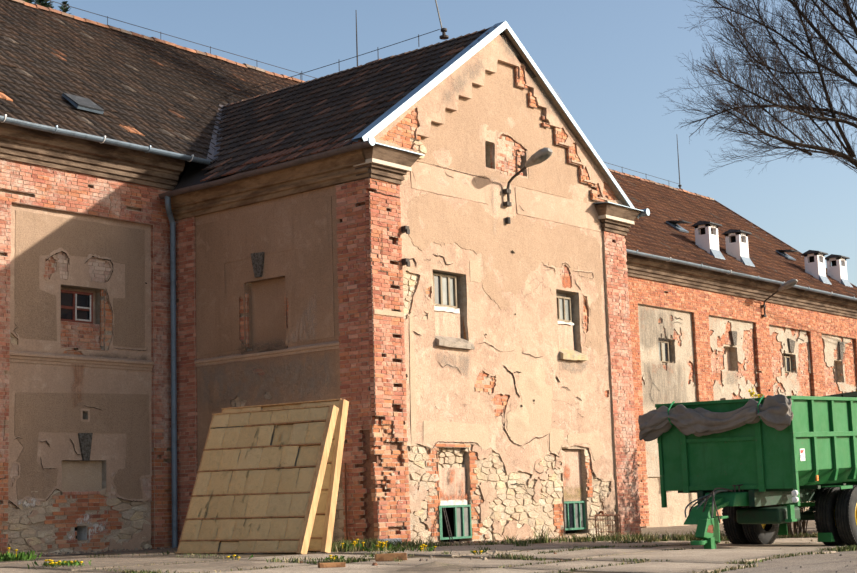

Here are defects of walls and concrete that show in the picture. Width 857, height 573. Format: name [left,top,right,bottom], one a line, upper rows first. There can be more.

spalling [490,134,527,176]
spalling [394,271,436,320]
spalling [582,296,590,334]
spalling [742,329,755,366]
spalling [771,351,783,379]
spalling [797,342,810,377]
spalling [842,341,857,387]
spalling [474,371,509,417]
crack [479,341,559,495]
peeling [424,538,576,562]